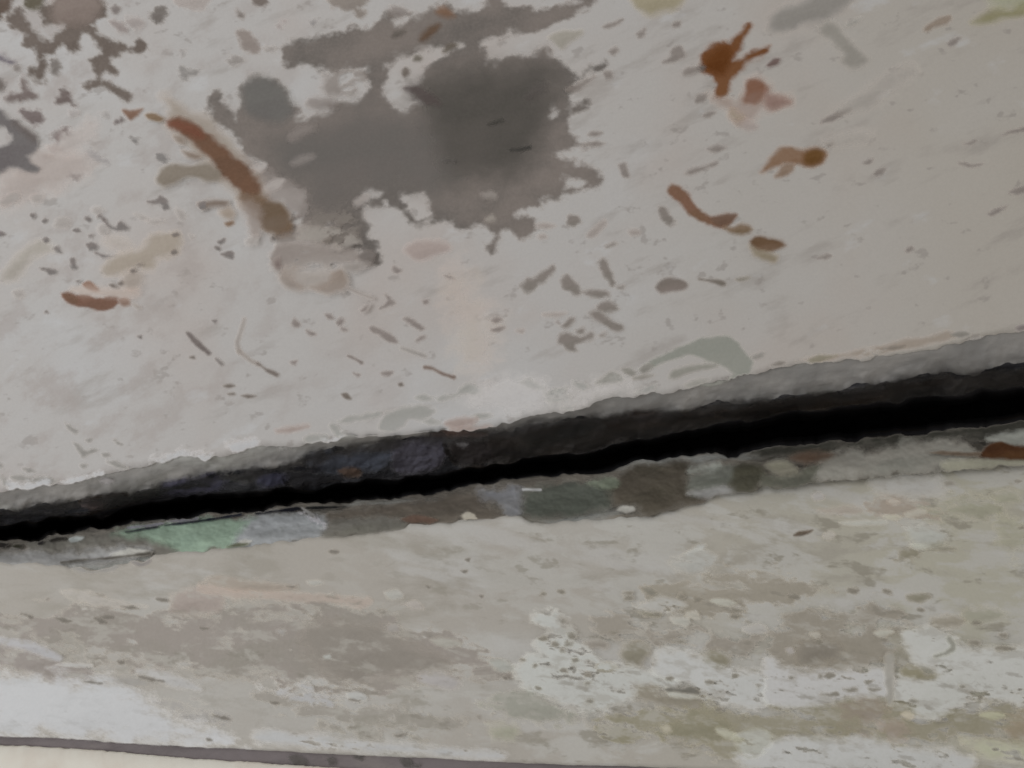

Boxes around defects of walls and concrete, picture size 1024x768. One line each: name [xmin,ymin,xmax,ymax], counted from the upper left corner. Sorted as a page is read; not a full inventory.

leakage [632,0,684,15]
corrosion [699,22,794,129]
corrosion [122,98,293,236]
corrosion [761,146,827,178]
corrosion [667,184,786,263]
peeling [0,424,128,490]
peeling [156,450,211,463]
peeling [227,438,259,452]
crack [0,331,1024,572]
peeling [822,480,1024,549]
leakage [0,637,92,667]
leakage [136,662,202,691]